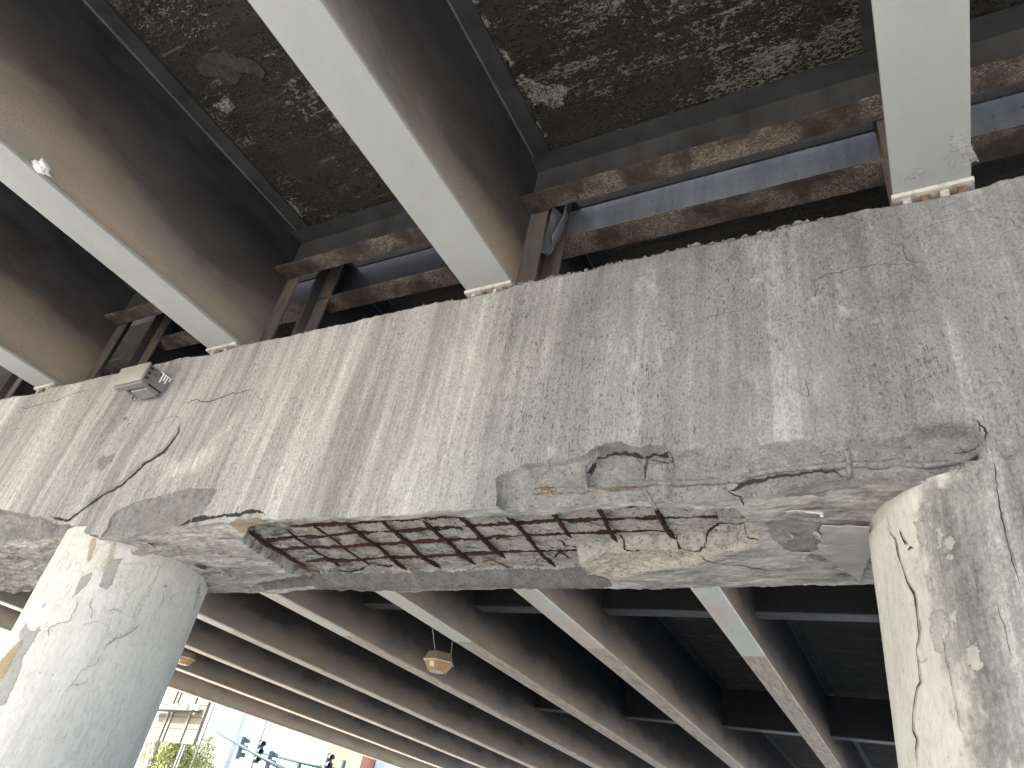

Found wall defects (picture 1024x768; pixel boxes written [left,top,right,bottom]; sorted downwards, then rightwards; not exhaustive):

crack [52,389,263,522]
peeling [0,509,101,546]
crack [180,505,265,526]
spalling [230,430,983,592]
crack [976,420,1020,585]
peeling [72,549,152,598]
peeling [0,623,41,706]
crack [887,519,960,763]
peeling [929,609,957,653]
peeling [965,643,983,673]